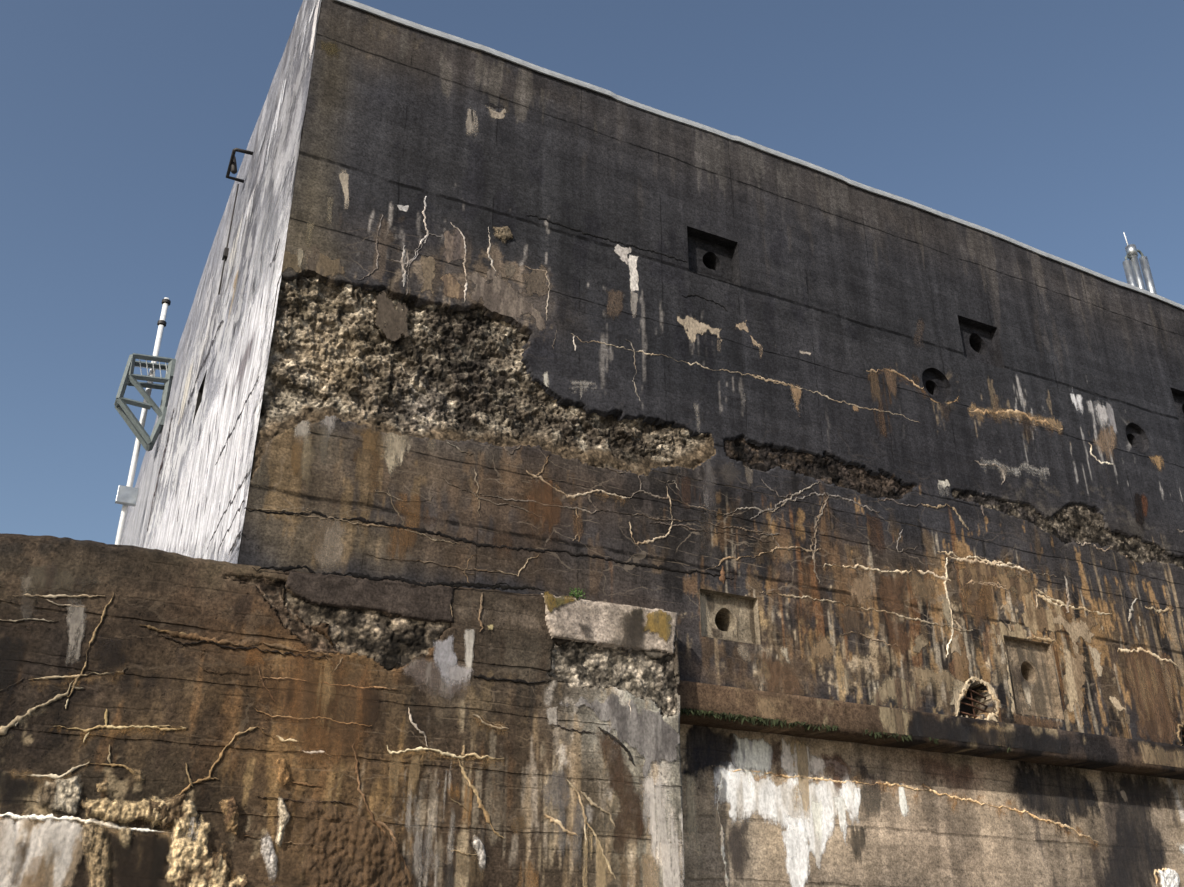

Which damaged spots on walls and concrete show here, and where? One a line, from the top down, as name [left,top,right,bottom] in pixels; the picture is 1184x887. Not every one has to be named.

crack [358,196,496,302]
spalling [251,226,916,500]
crack [0,586,186,742]
spalling [547,624,680,777]
crack [207,440,1173,657]
rust [871,667,958,711]
rust [802,557,1030,626]
peeling [949,556,1103,747]
rust [1027,635,1065,707]
damp [0,745,250,887]
damp [576,731,684,887]
damp [681,725,884,887]